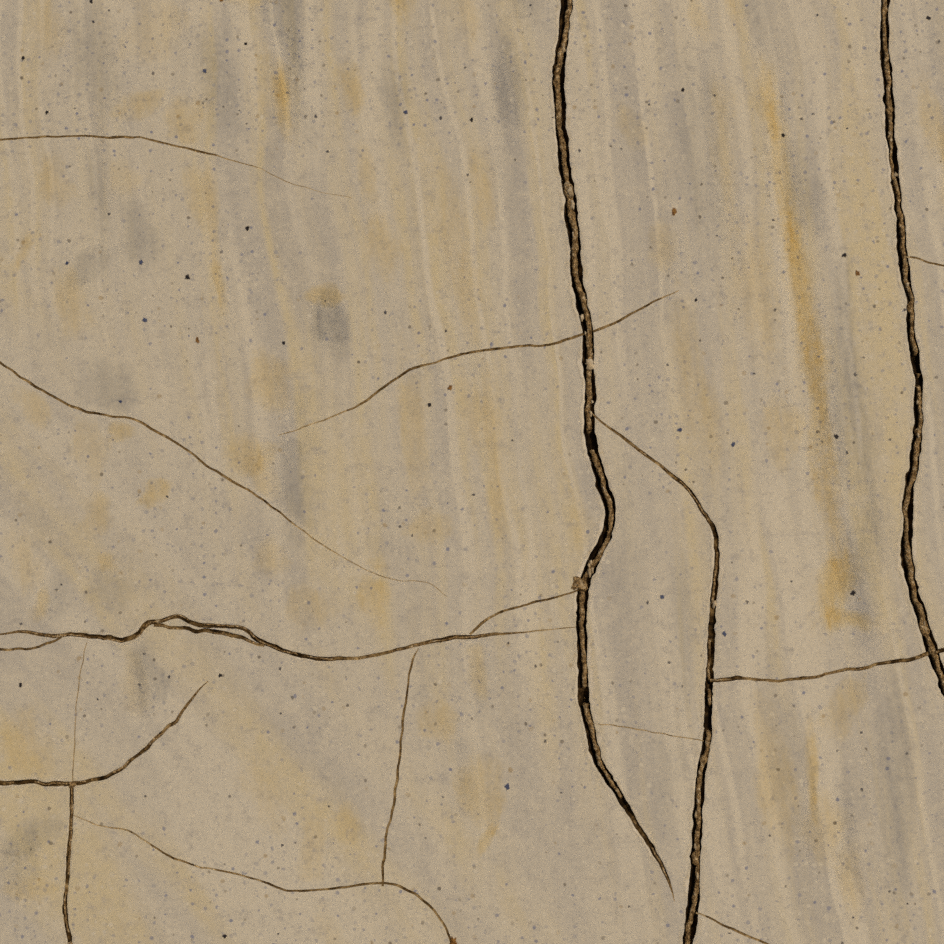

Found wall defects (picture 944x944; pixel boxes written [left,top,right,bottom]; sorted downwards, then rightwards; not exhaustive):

crack [0,135,351,198]
crack [0,361,447,597]
crack [278,0,944,944]
crack [0,589,579,663]
crack [0,642,457,944]